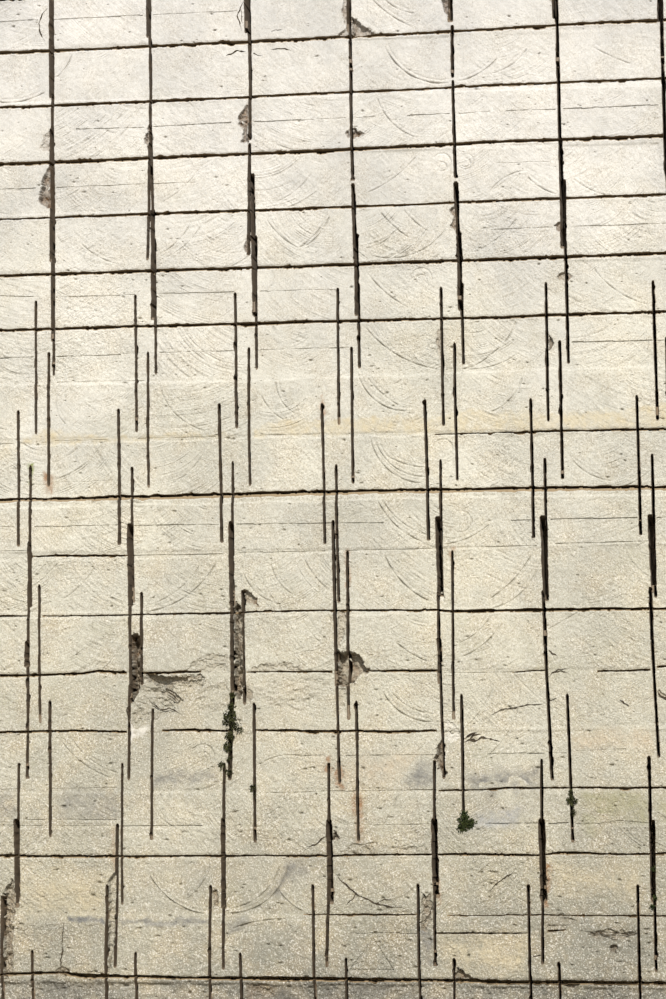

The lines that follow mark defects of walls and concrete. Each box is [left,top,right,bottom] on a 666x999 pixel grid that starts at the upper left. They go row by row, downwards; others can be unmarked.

spalling [337,0,377,40]
spalling [38,131,50,154]
spalling [237,101,249,145]
spalling [37,167,51,209]
spalling [131,588,305,729]
spalling [335,611,371,714]
leakage [458,755,547,838]